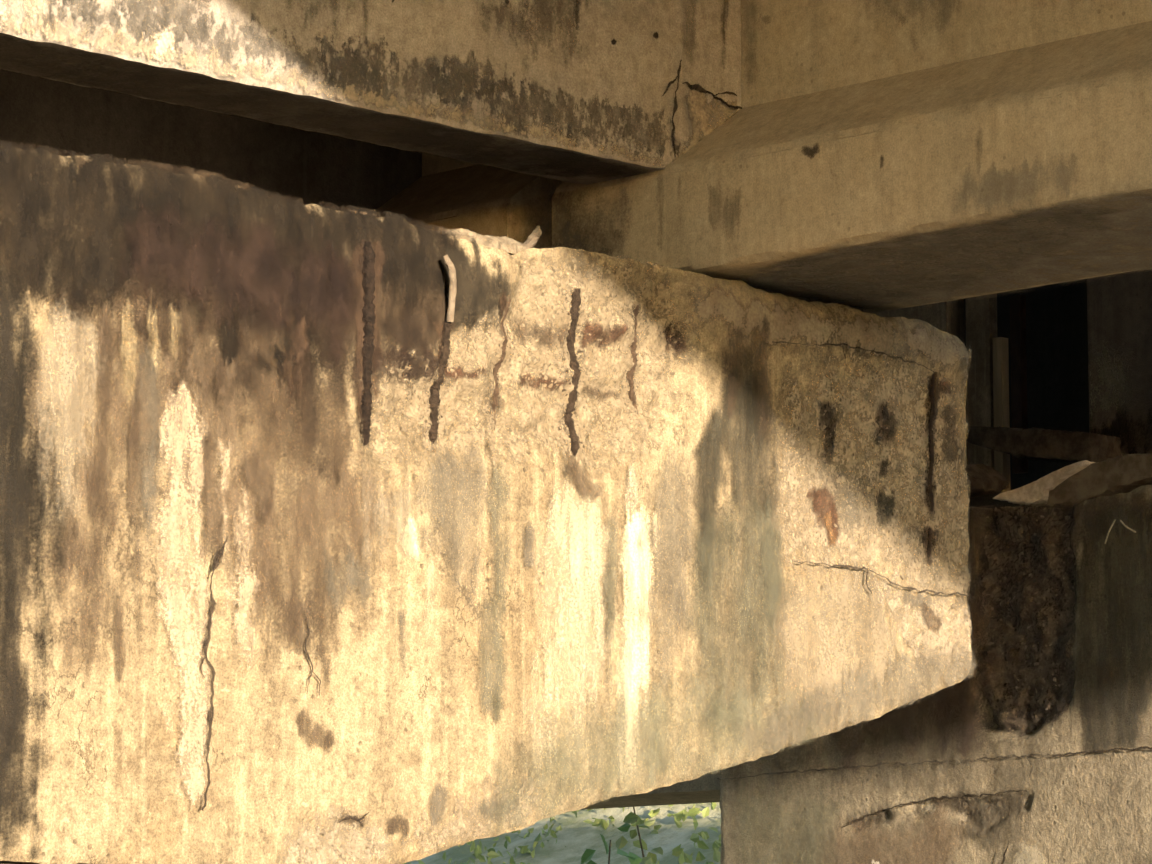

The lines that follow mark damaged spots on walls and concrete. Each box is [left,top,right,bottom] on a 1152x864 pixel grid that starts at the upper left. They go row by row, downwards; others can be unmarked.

leakage [0,0,680,177]
crack [662,60,742,157]
leakage [538,191,620,256]
leakage [746,166,1152,307]
leakage [0,141,511,855]
corrosion [807,487,840,544]
leakage [524,315,1152,864]
crack [795,561,975,598]
crack [200,536,228,811]
crack [717,746,1152,780]